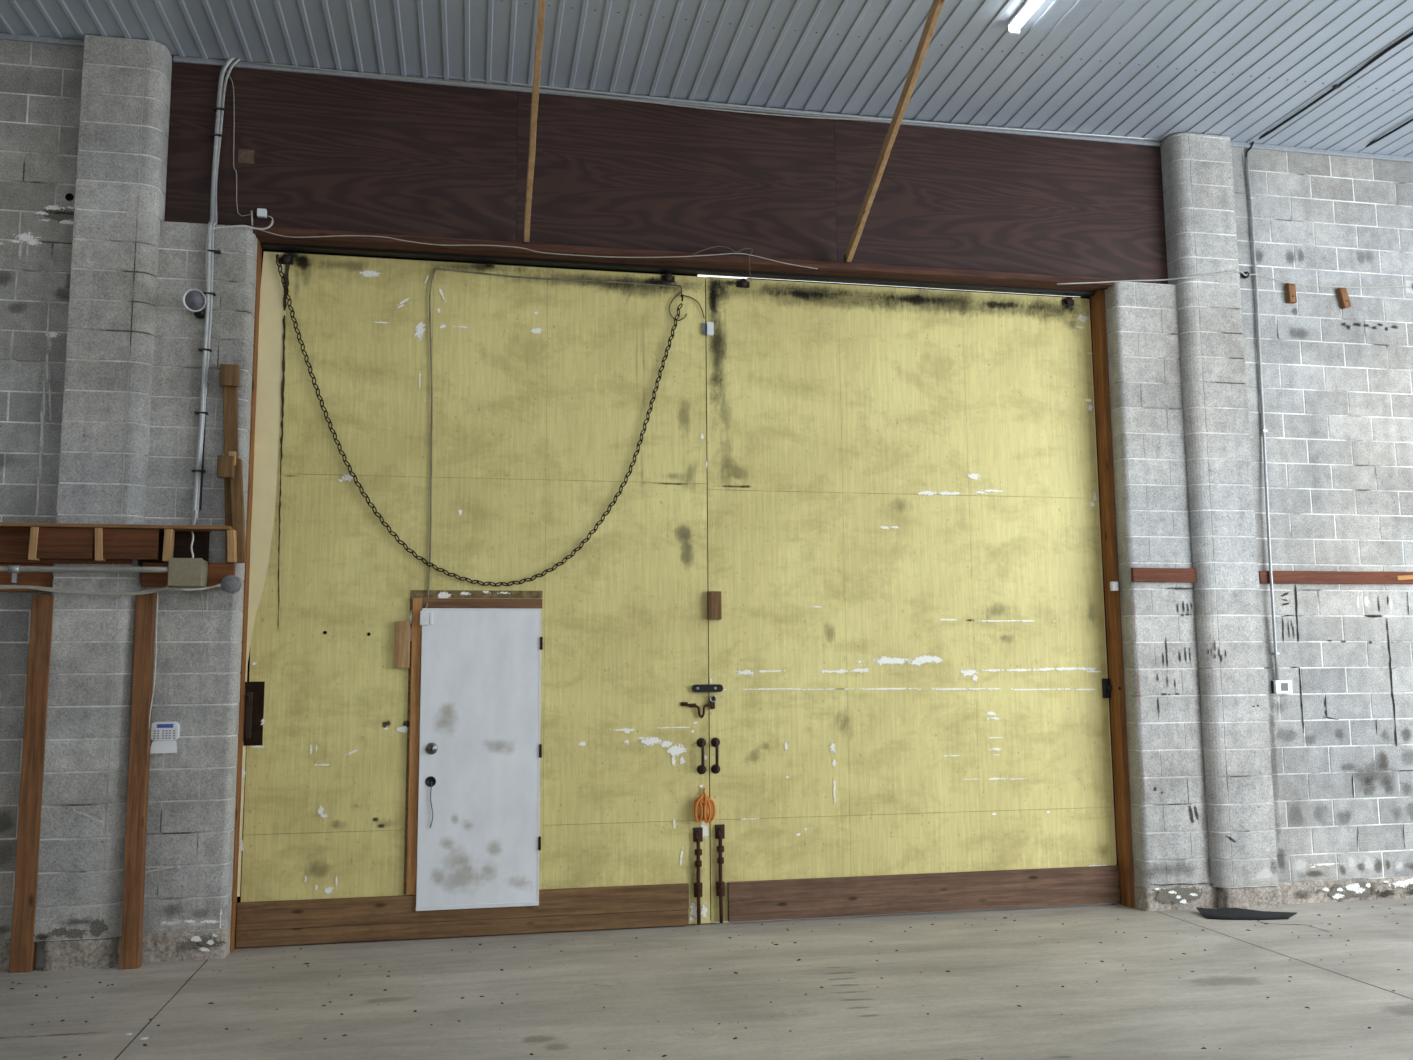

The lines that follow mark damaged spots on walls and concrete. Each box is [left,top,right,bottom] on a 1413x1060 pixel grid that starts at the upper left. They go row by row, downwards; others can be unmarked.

water stain [598,277,671,289]
water stain [710,280,734,312]
water stain [767,287,841,299]
water stain [887,294,970,309]
water stain [987,302,1073,312]
water stain [712,329,723,382]
water stain [37,332,60,503]
peeling [917,474,1002,496]
peeling [710,655,1101,691]
peeling [610,722,707,766]
spalling [1153,885,1209,904]
spalling [1313,877,1413,902]